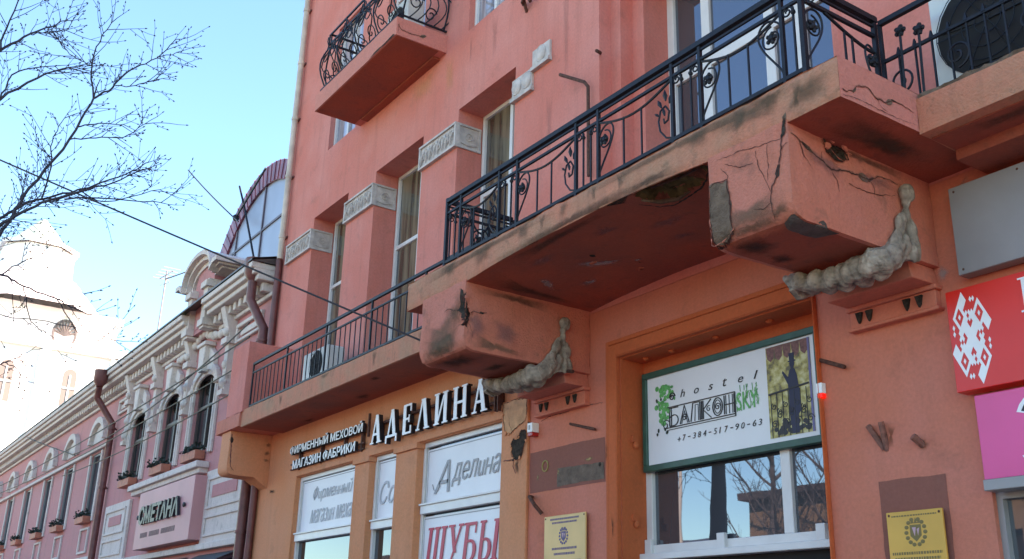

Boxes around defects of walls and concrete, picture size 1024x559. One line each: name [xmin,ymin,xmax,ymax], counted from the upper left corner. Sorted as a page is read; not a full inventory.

crack [843,84,911,123]
crack [719,112,898,219]
hole [822,138,850,162]
spalling [635,165,734,250]
flaking render [458,289,473,327]
flaking render [501,398,527,460]